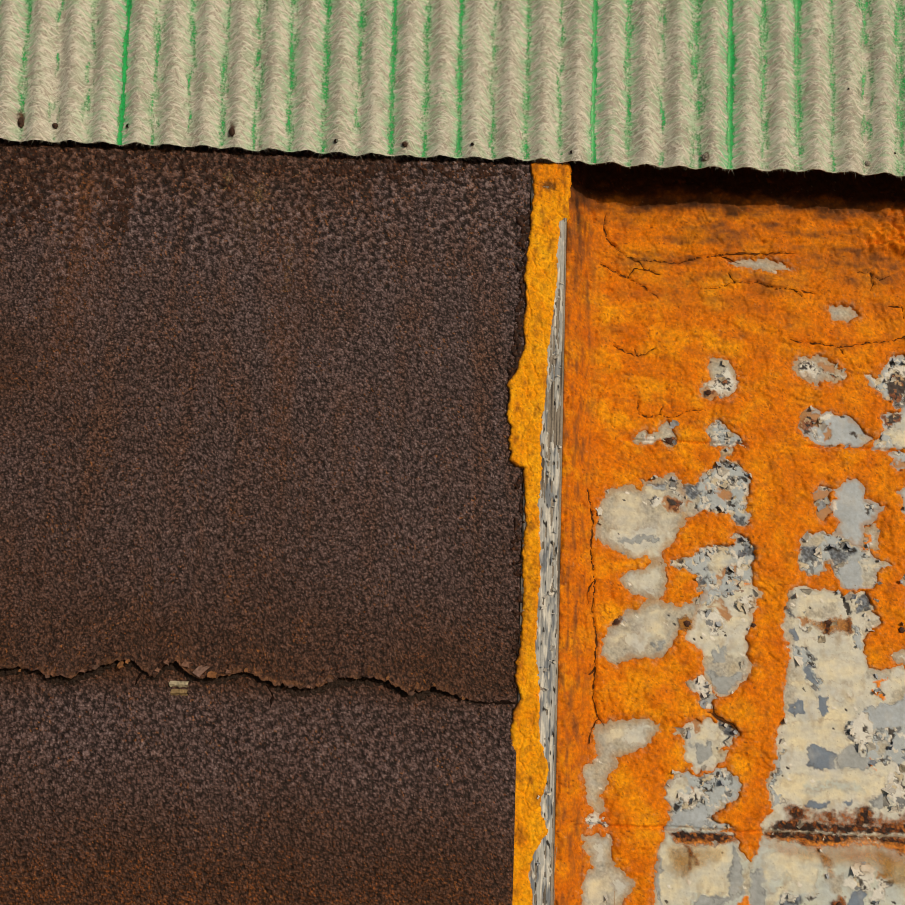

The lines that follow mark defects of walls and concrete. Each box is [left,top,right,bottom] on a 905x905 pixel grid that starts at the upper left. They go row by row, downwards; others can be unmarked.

crack [601,213,813,298]
crack [790,306,905,355]
peeling [699,357,739,401]
peeling [792,354,905,471]
peeling [528,220,565,905]
crack [0,659,516,707]
peeling [594,420,905,905]
peeling [580,718,661,905]
rust [672,830,737,869]
rust [766,805,905,852]